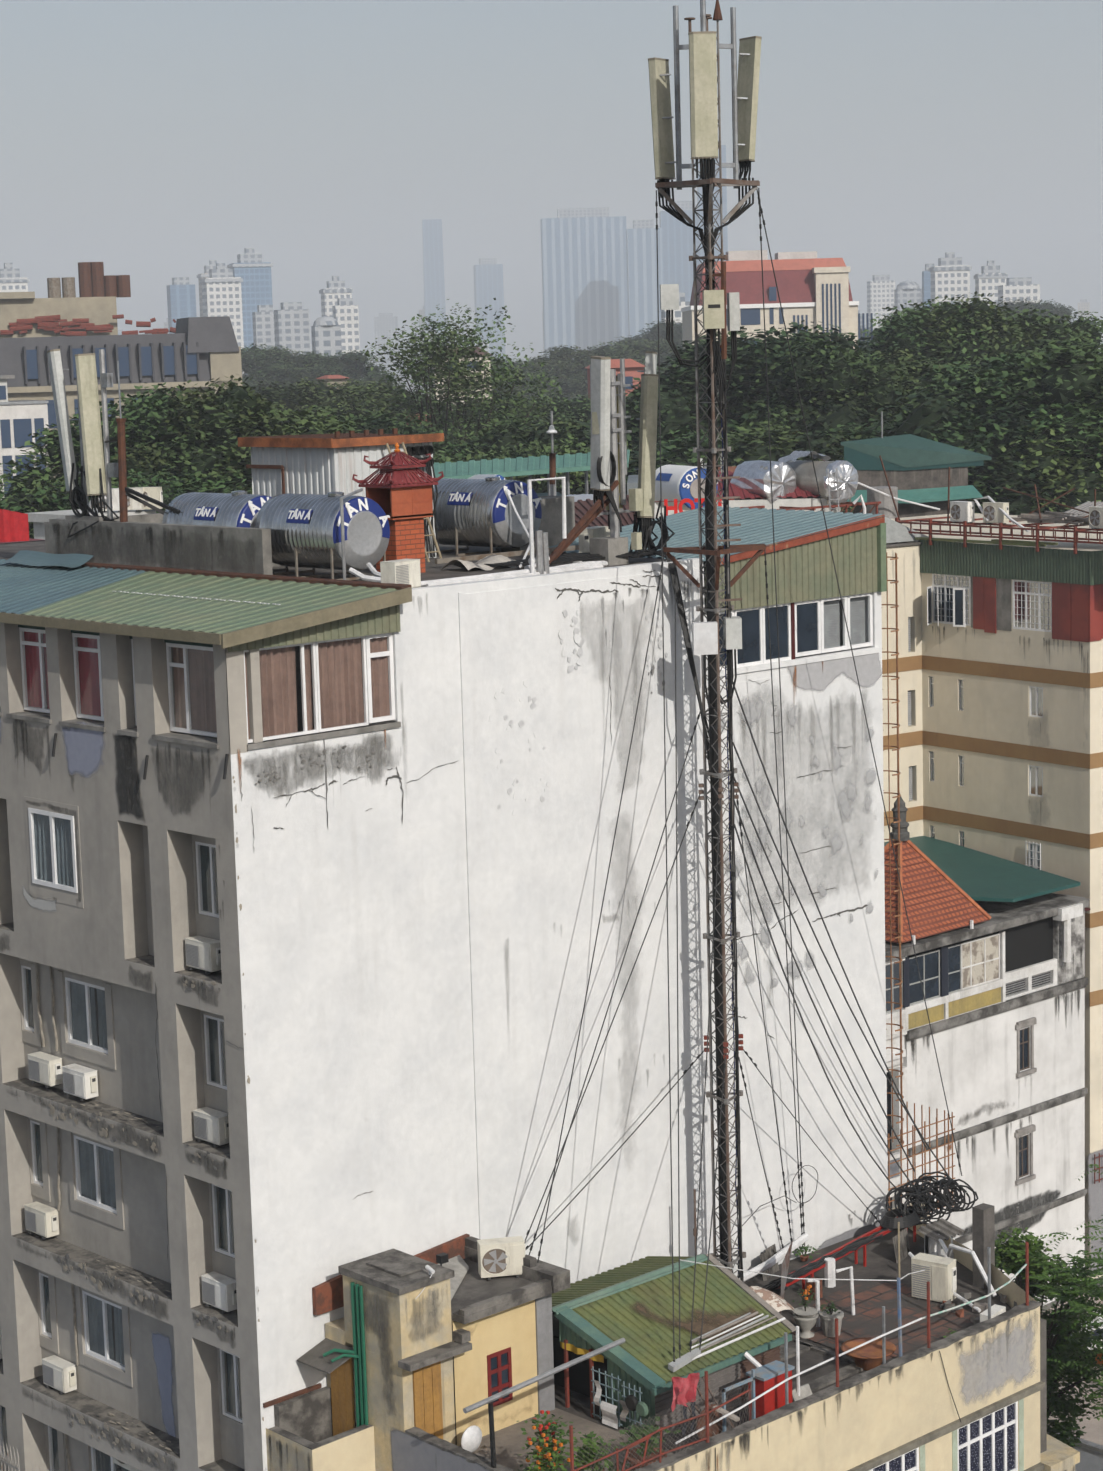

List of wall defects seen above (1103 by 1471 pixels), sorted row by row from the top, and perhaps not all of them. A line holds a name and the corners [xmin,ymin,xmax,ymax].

crack [555,570,659,601]
leakage [115,735,209,818]
leakage [245,736,390,793]
crack [241,741,457,847]